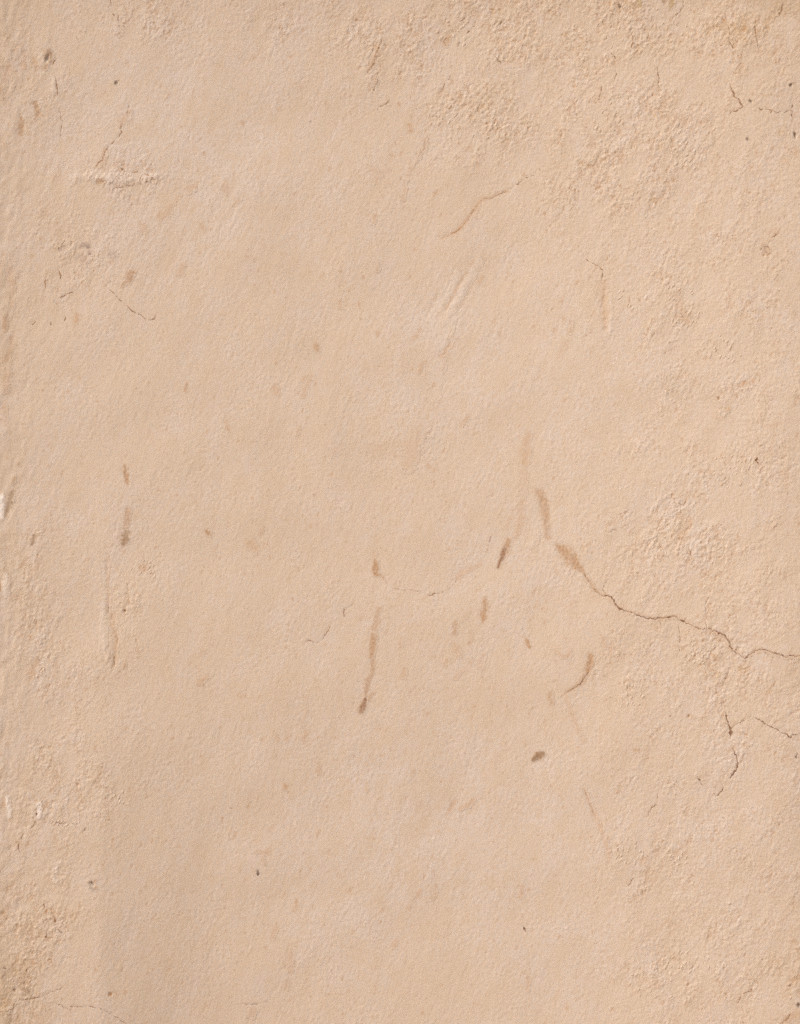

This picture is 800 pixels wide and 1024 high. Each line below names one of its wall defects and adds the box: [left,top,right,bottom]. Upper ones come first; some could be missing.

crack [585,575,800,796]